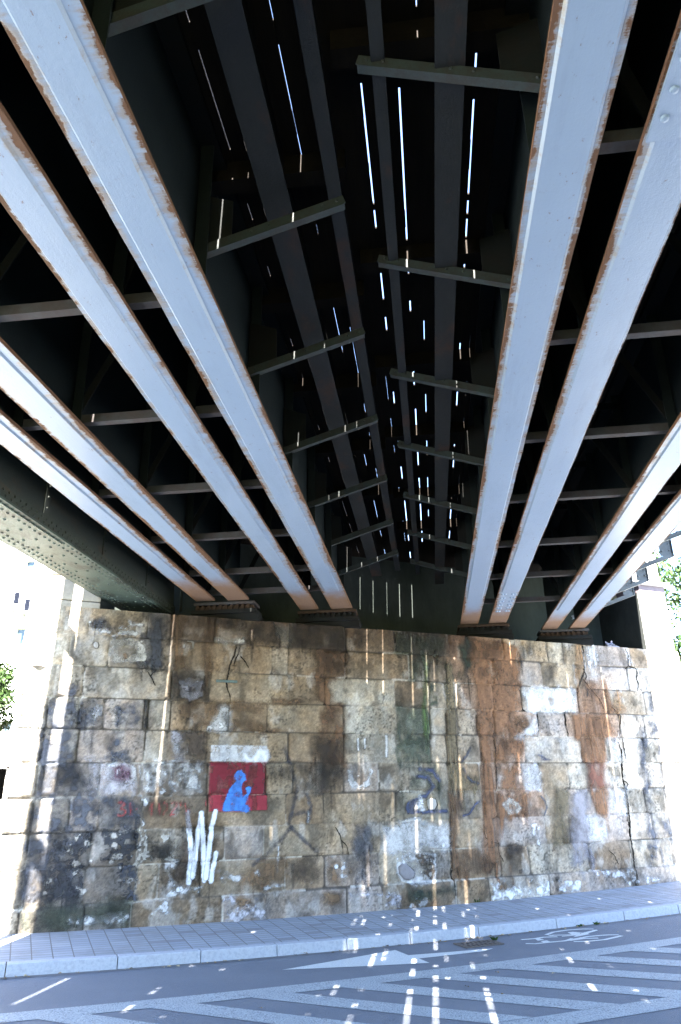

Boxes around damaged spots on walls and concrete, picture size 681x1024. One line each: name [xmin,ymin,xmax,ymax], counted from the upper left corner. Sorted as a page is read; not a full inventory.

crack [226,646,249,701]
corrosion [445,637,529,888]
corrosion [573,644,624,816]
crack [564,647,639,885]
leakage [61,883,129,924]